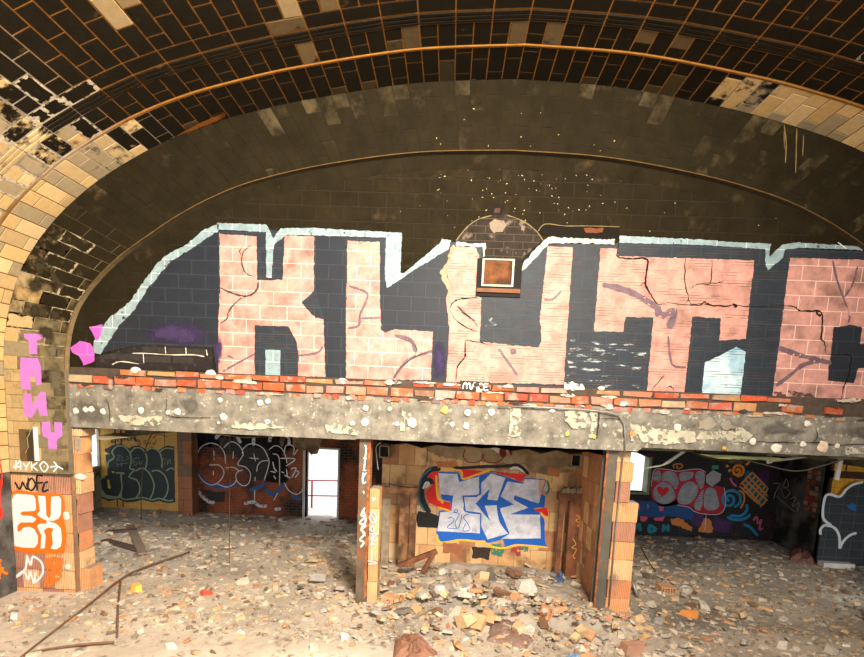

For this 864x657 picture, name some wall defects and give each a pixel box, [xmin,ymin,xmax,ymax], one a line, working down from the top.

leakage [6,231,95,358]
crack [602,233,852,399]
crack [832,260,858,323]
flaking render [69,342,864,461]